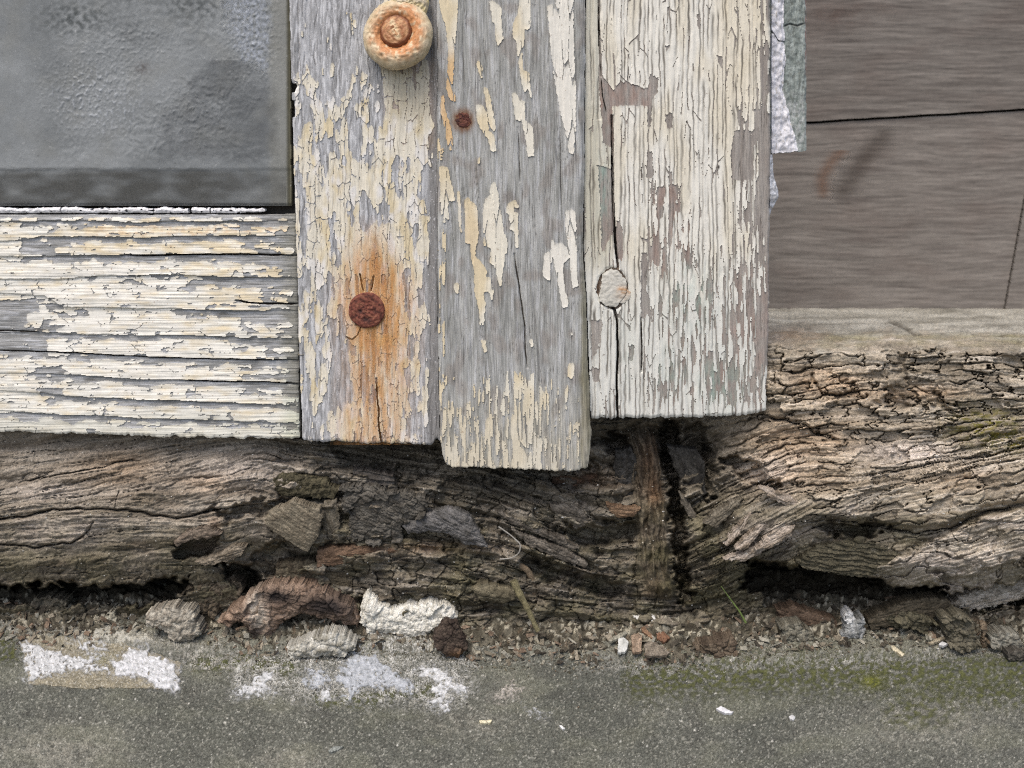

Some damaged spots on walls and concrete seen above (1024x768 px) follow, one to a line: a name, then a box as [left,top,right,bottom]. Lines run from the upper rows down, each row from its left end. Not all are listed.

peeling [0,0,798,471]